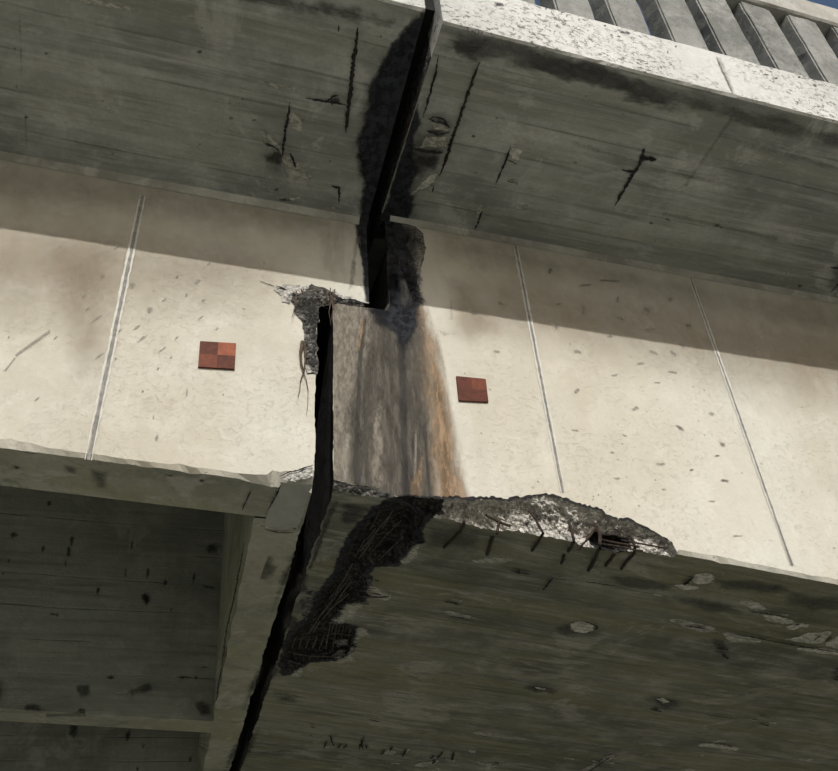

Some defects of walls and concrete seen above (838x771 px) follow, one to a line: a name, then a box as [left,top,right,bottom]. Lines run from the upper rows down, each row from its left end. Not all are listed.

crack [307,25,359,132]
spalling [261,220,426,374]
damp [333,11,435,497]
crack [614,148,657,205]
corrosion [418,306,466,497]
crack [216,542,245,701]
spalling [278,493,677,677]
spalling [670,601,838,659]